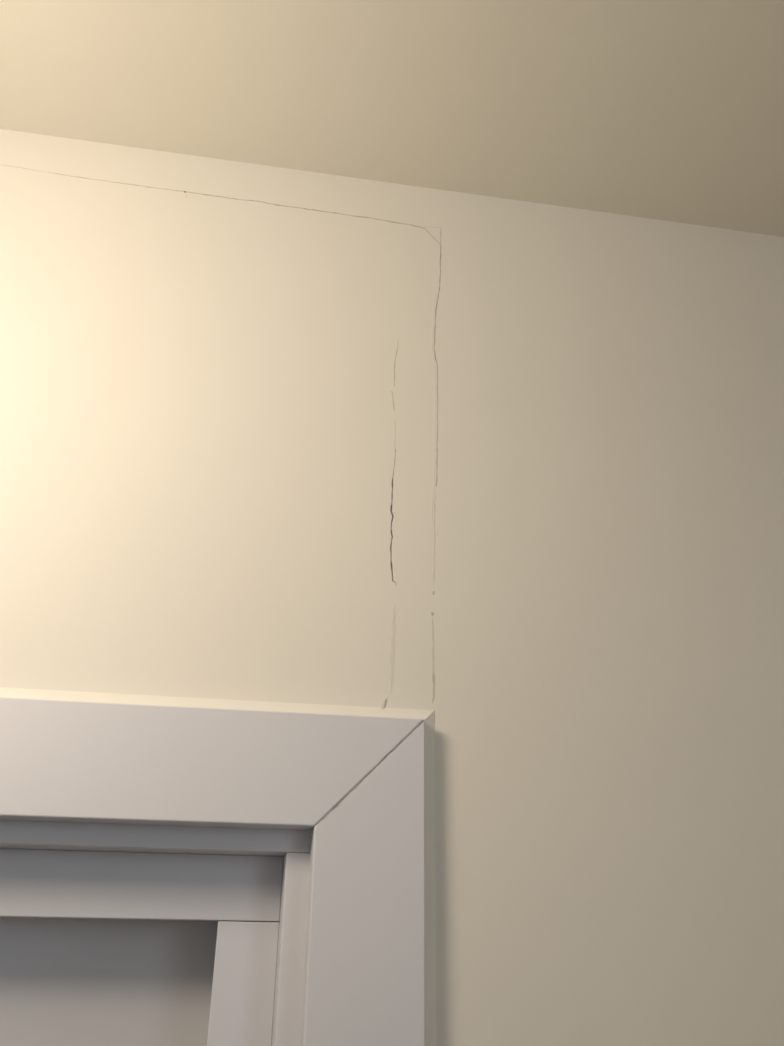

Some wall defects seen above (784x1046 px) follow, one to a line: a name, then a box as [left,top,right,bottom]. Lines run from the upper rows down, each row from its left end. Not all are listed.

crack [0,164,441,825]